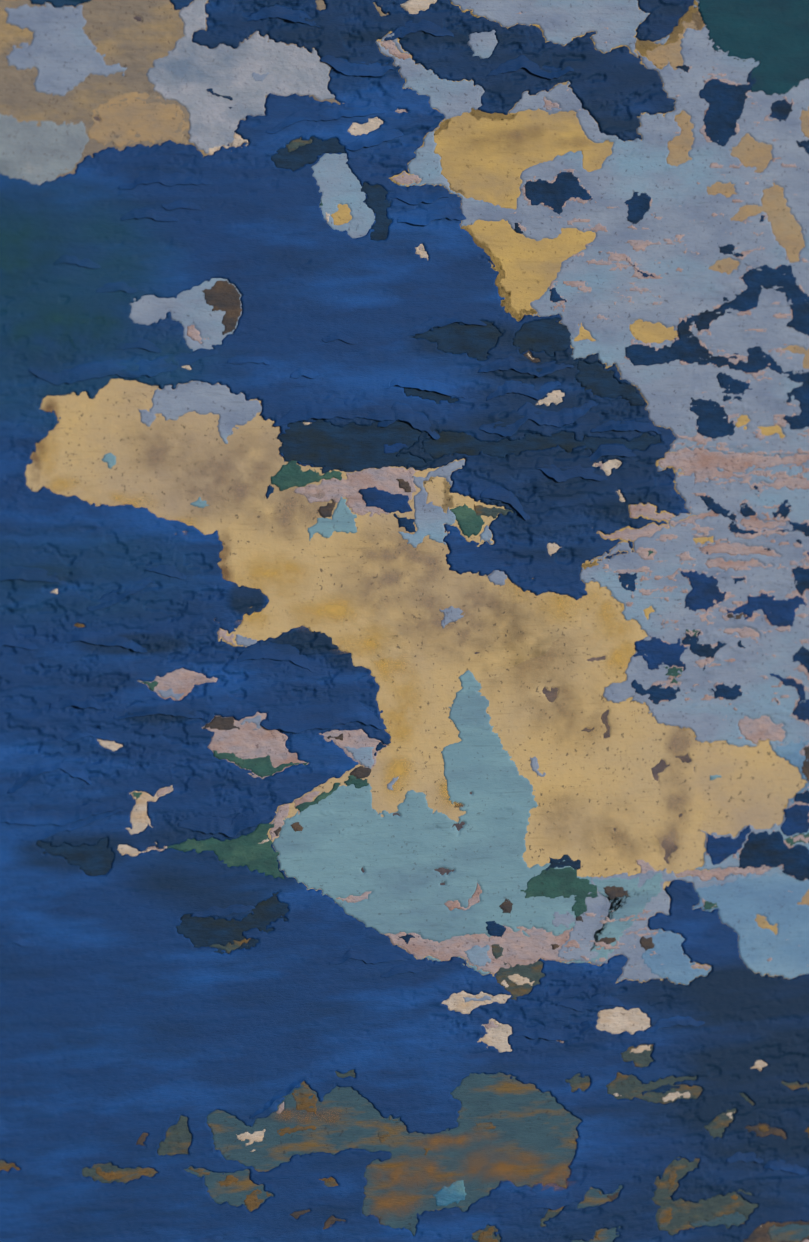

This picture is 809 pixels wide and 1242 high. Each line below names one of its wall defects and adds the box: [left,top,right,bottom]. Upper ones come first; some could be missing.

peeling [25,0,809,1014]
peeling [477,1018,512,1052]
peeling [596,1007,705,1068]
peeling [565,1073,591,1092]
peeling [743,1220,809,1242]